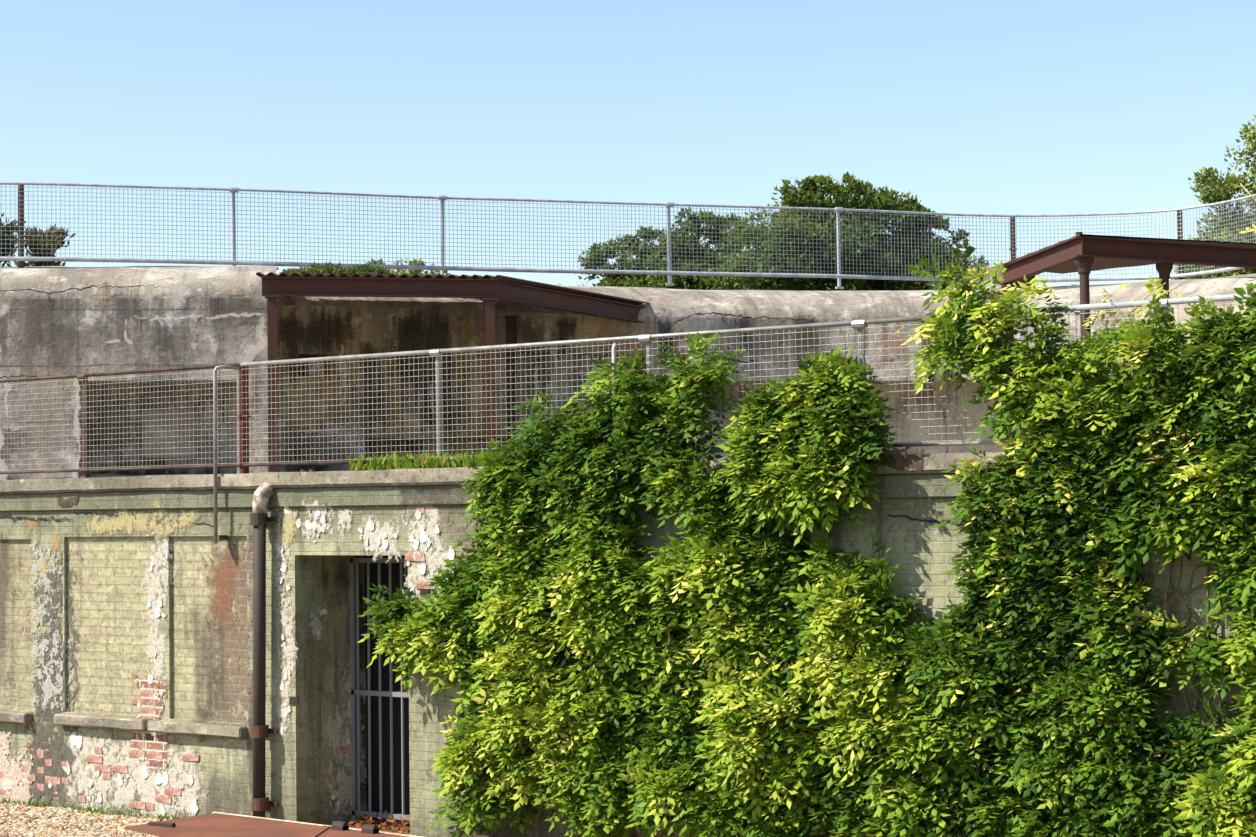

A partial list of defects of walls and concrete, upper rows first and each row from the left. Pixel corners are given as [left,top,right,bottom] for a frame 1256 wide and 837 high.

crack [0,285,160,302]
water stain [81,282,485,457]
crack [518,351,619,362]
crack [665,312,816,363]
spalling [0,524,253,820]
peeling [323,664,367,826]
peeling [271,500,488,736]